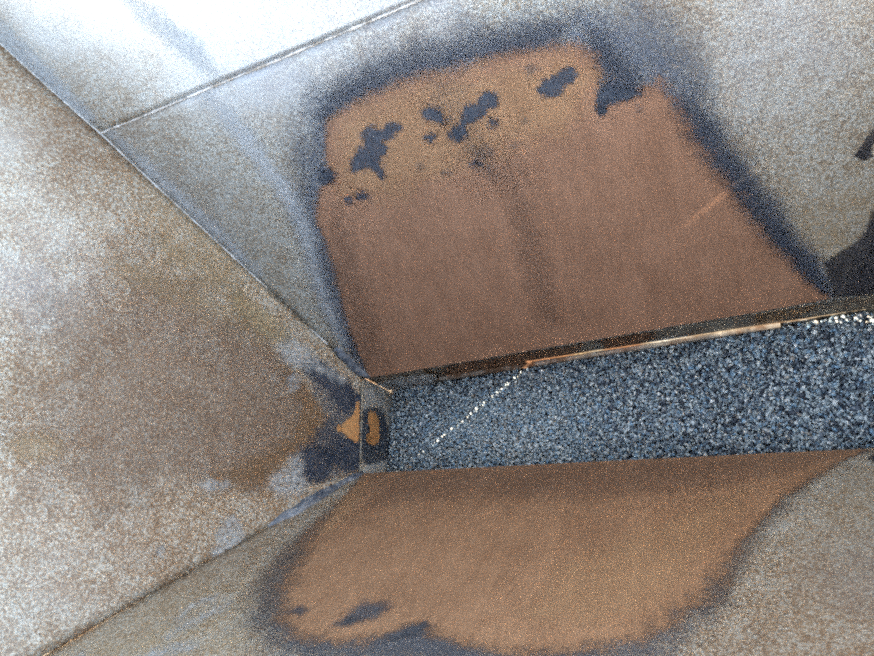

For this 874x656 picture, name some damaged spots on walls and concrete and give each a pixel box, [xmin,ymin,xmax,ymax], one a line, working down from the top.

water stain [0,24,91,120]
water stain [203,3,874,373]
corrosion [316,42,829,377]
water stain [234,291,436,495]
corrosion [337,401,380,445]
efflorescence [212,517,244,557]
water stain [252,550,723,656]
corrosion [276,449,865,656]